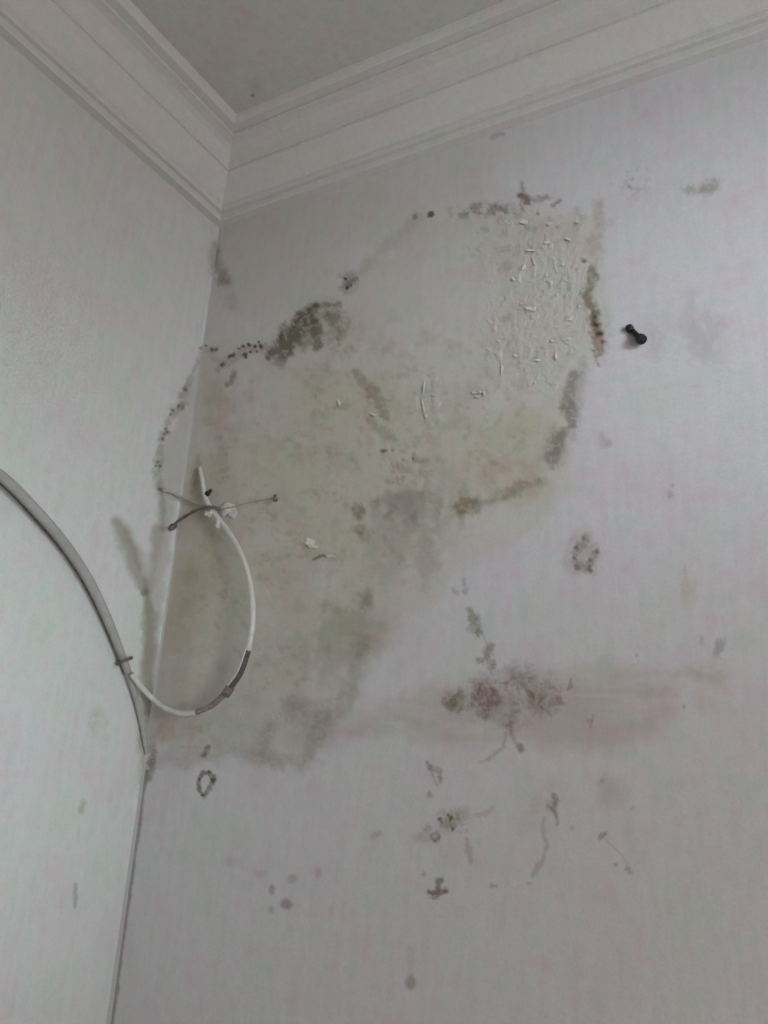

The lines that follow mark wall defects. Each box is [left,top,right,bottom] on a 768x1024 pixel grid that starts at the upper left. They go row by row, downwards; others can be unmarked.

water stain [133,120,740,801]
peeling [459,195,602,403]